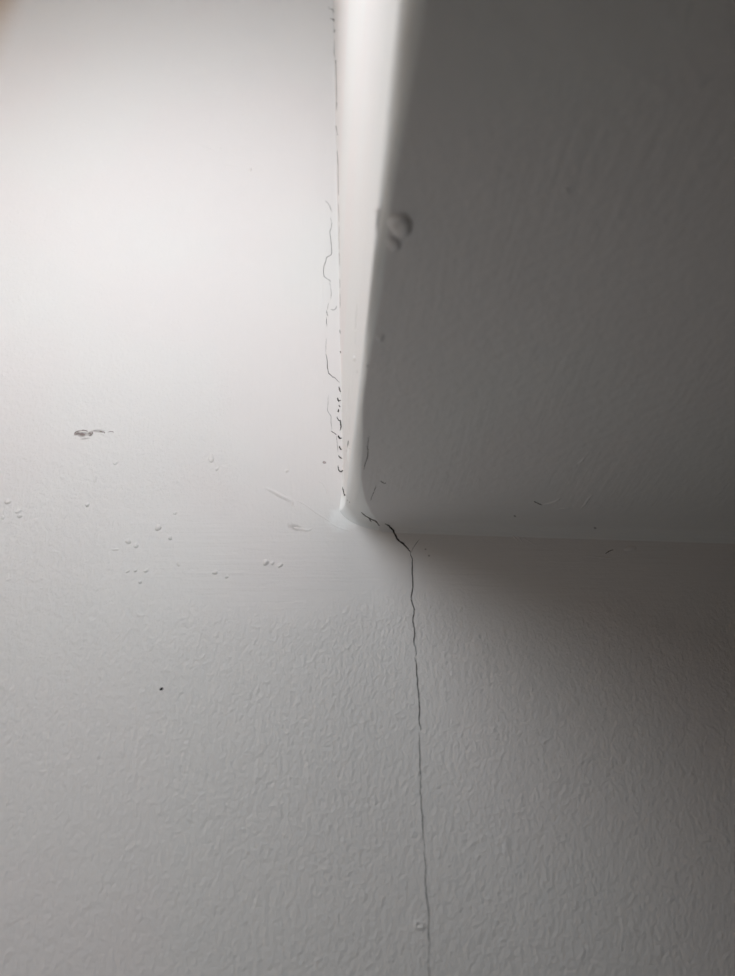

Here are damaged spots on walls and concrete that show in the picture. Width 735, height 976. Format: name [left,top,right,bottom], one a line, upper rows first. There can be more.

crack [326,351,430,976]